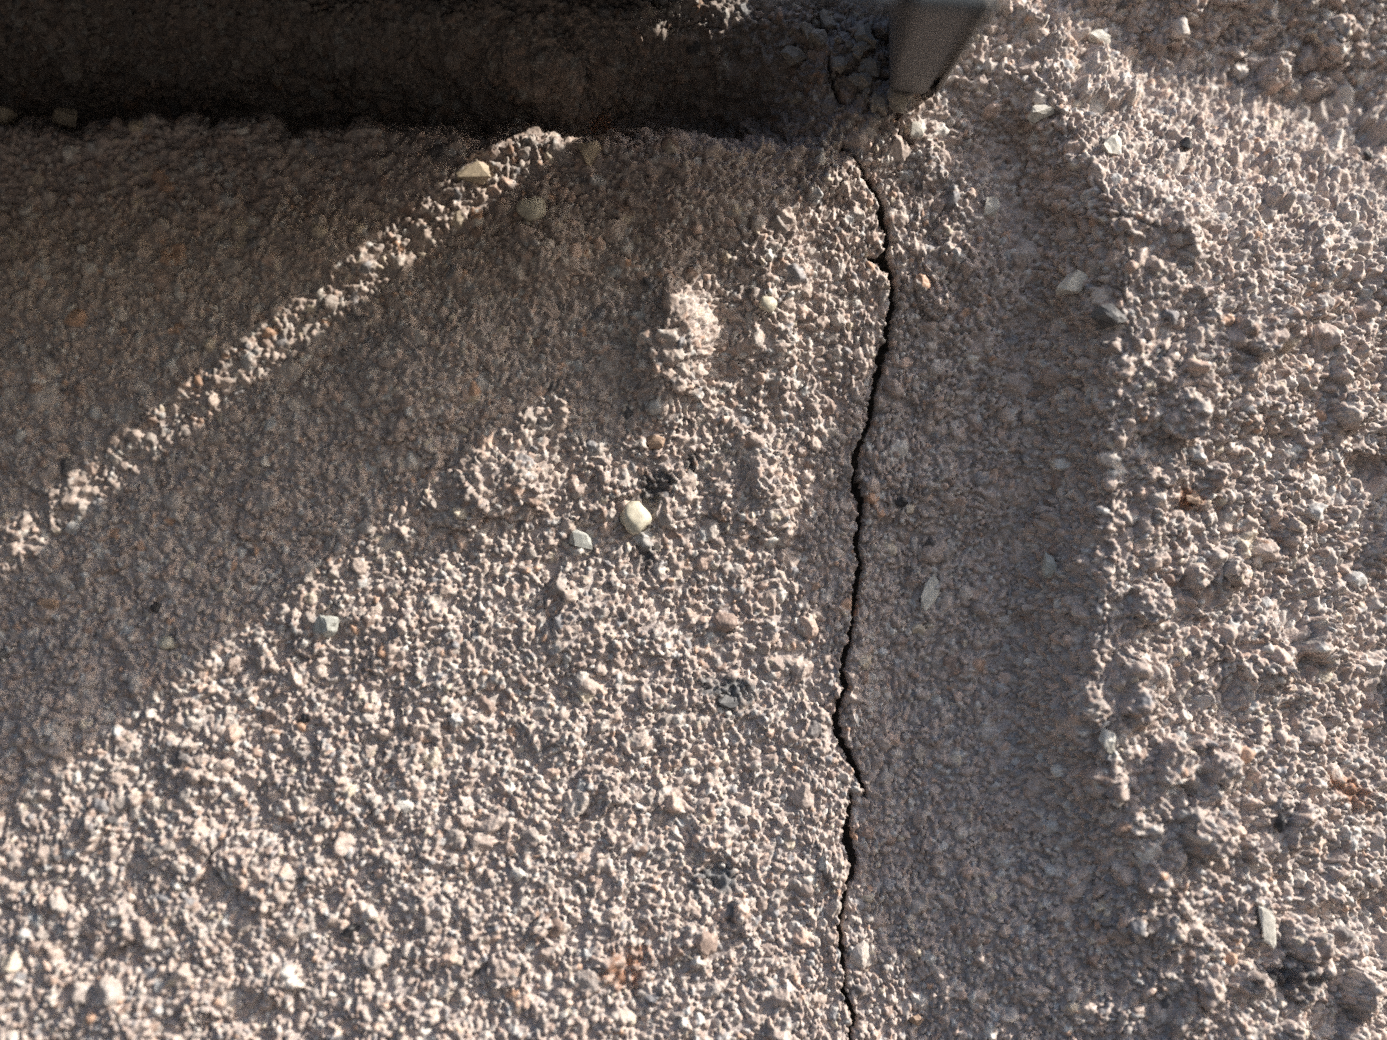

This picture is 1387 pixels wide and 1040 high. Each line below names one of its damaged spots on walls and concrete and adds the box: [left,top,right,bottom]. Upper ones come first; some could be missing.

crack [832,149,895,1040]